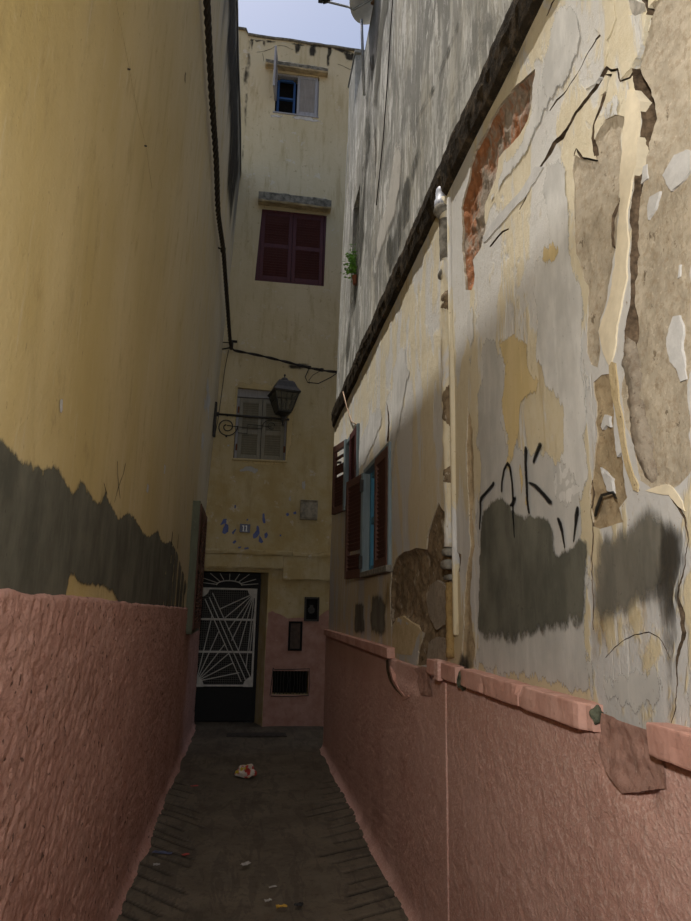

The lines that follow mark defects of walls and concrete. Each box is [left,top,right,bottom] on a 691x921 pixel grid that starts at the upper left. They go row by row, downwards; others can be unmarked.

crack [547,67,657,162]
crack [611,174,643,278]
flaking render [391,0,691,700]
crack [629,307,639,346]
damp [657,527,681,623]
flaking render [598,713,667,793]